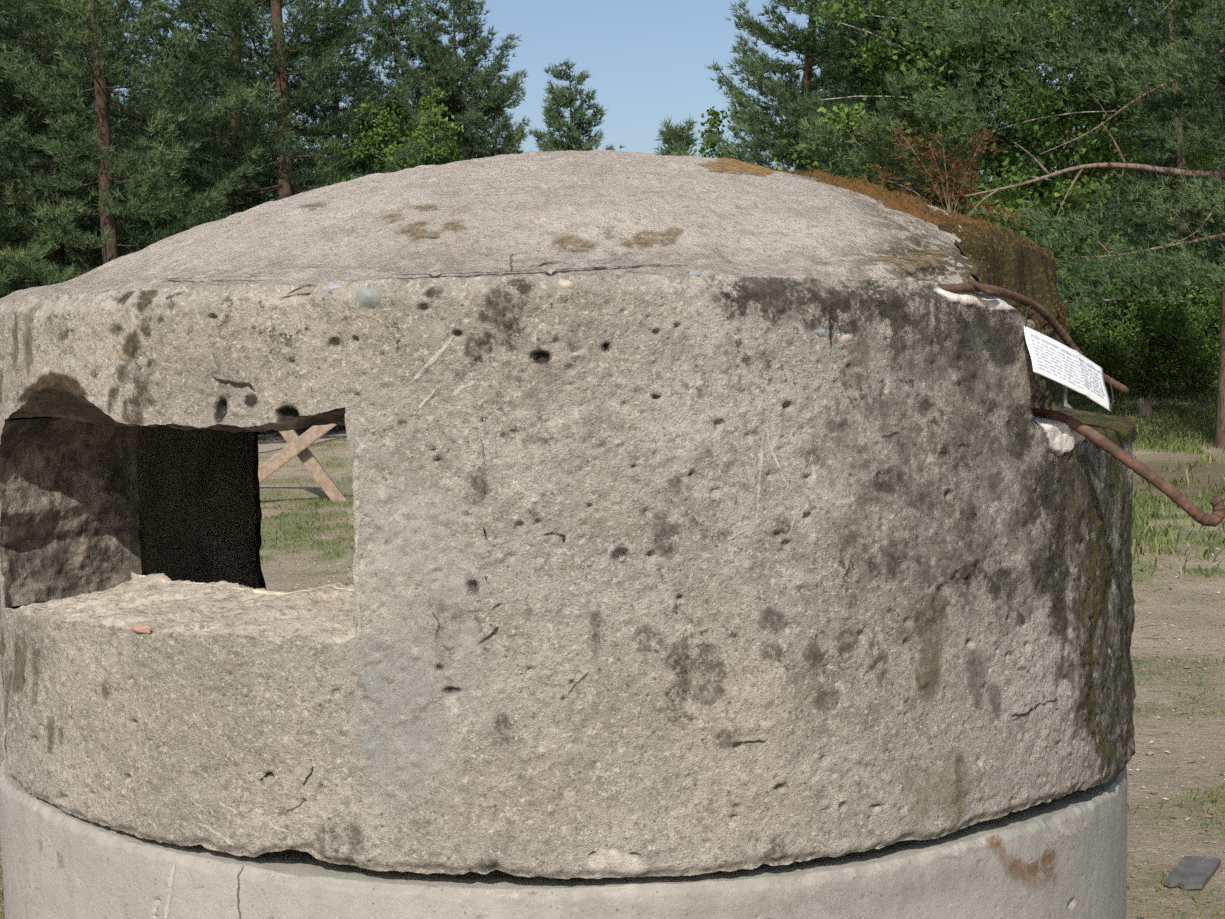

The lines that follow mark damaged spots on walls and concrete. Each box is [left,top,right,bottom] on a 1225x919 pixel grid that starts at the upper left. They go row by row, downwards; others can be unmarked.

water stain [653,512,678,554]
water stain [709,276,1068,699]
water stain [1083,464,1126,758]
water stain [636,625,724,723]
crack [236,866,244,919]
rust [990,836,1056,883]